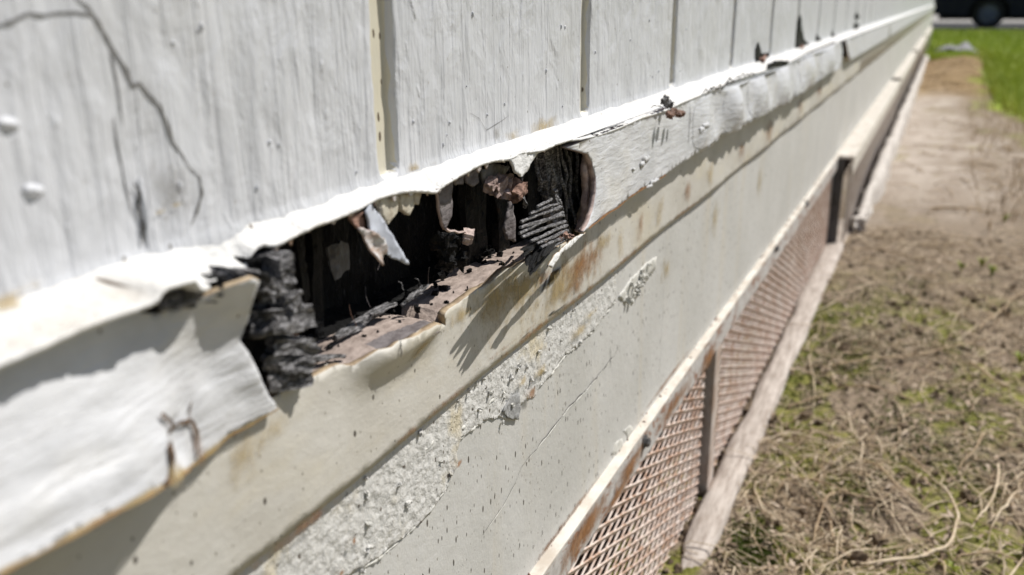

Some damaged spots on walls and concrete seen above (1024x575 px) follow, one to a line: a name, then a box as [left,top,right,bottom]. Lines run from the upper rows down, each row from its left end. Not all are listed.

crack [0,0,204,224]
spalling [272,239,293,251]
spalling [309,159,521,310]
spalling [508,142,586,268]
corrosion [589,186,647,229]
spalling [238,257,657,575]
crack [483,348,619,534]